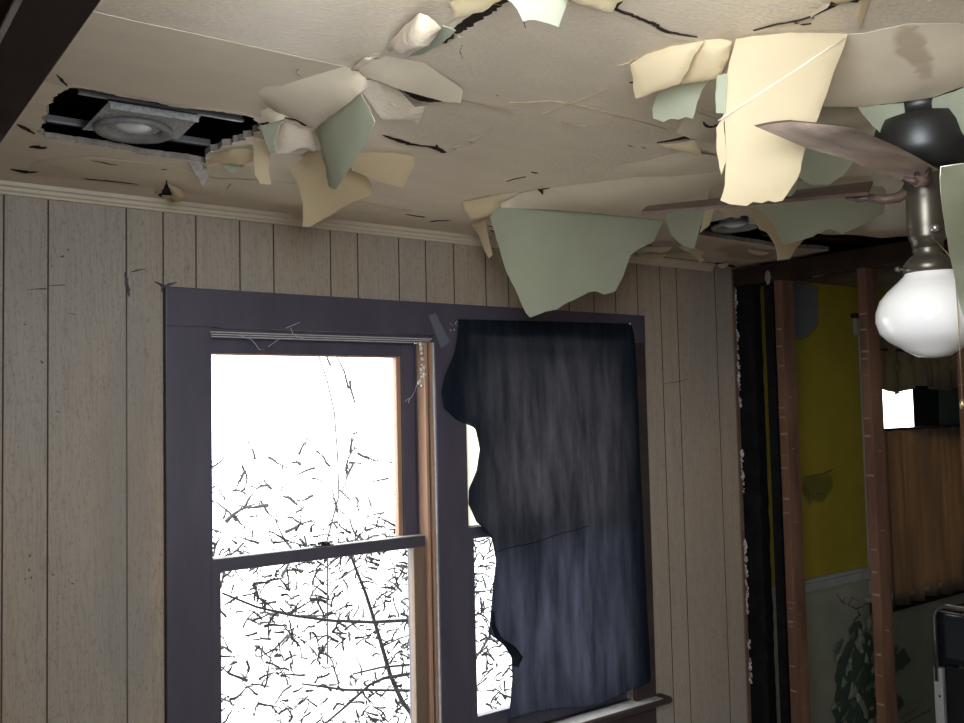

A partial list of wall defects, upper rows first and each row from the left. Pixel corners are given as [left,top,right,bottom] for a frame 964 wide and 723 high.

peeling [385,13,456,58]
crack [415,0,526,58]
peeling [450,0,620,27]
crack [567,0,697,41]
crack [753,0,859,34]
crack [351,51,391,71]
crack [380,59,725,155]
peeling [858,103,905,132]
peeling [932,88,964,135]
peeling [187,79,425,227]
peeling [462,32,886,317]
peeling [940,163,964,316]